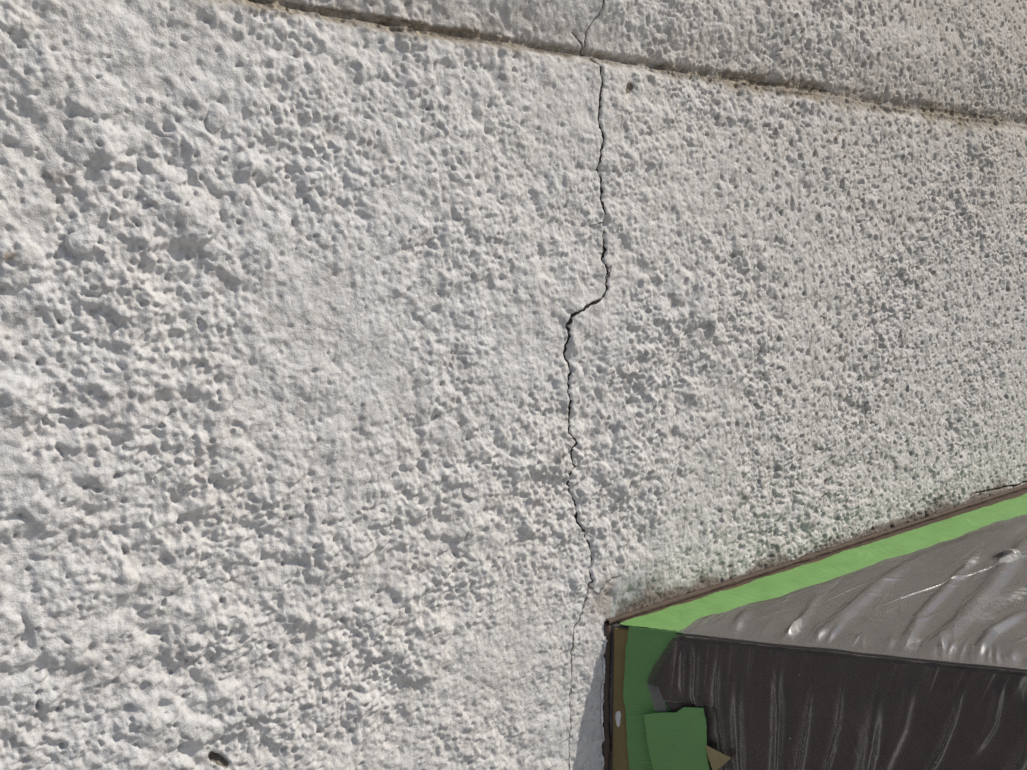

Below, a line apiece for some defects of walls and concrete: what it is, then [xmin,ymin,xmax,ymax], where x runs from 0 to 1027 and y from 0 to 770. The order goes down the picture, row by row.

crack [563,0,622,770]